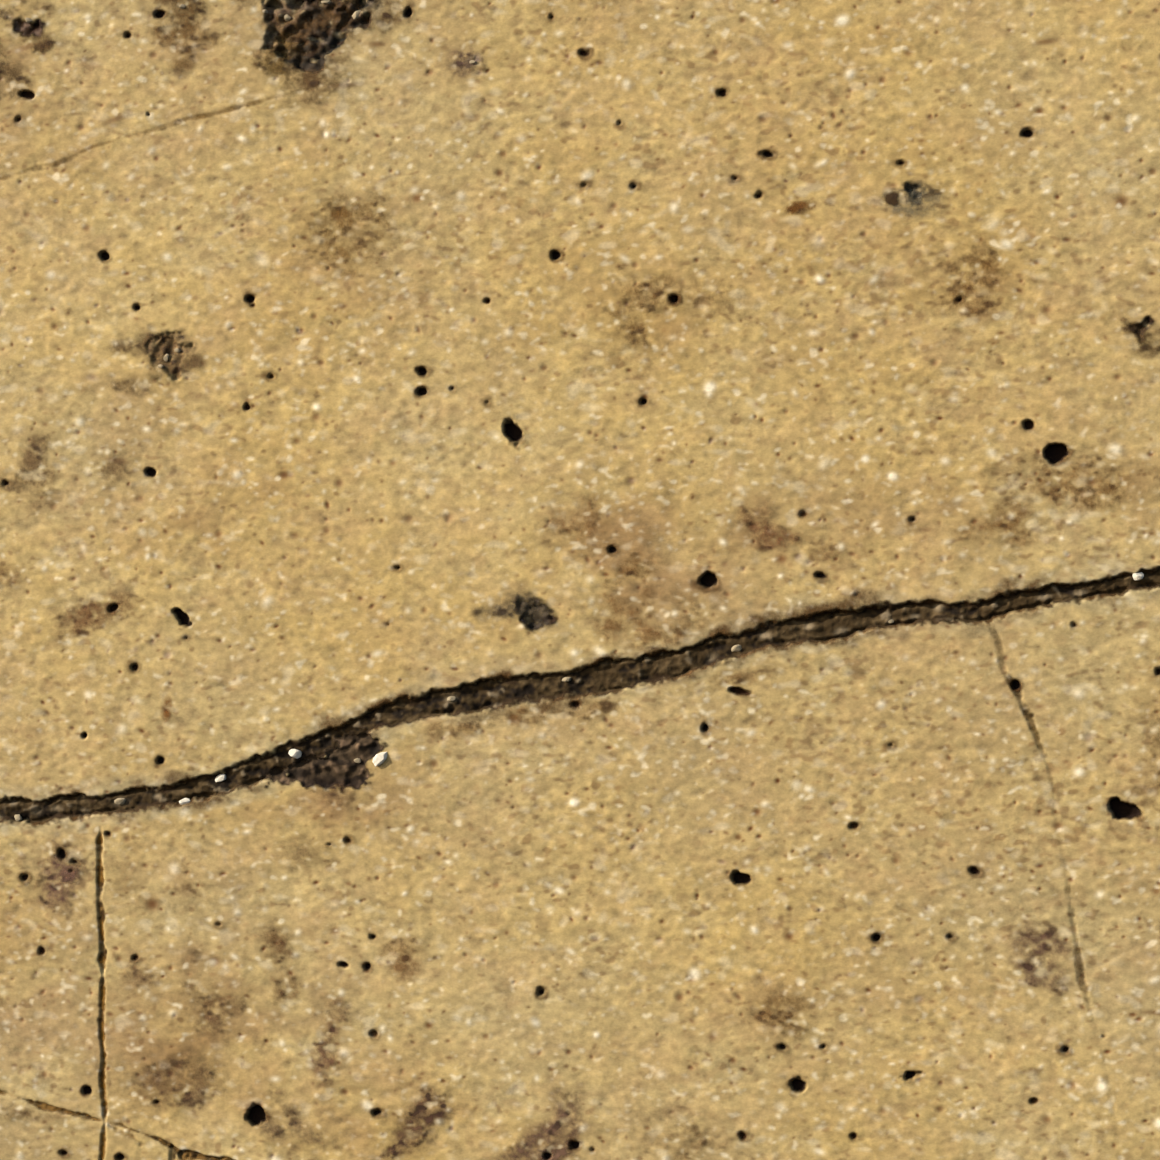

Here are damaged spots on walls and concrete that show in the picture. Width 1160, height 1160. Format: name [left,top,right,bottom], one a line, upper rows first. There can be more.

crack [0,566,1160,1160]